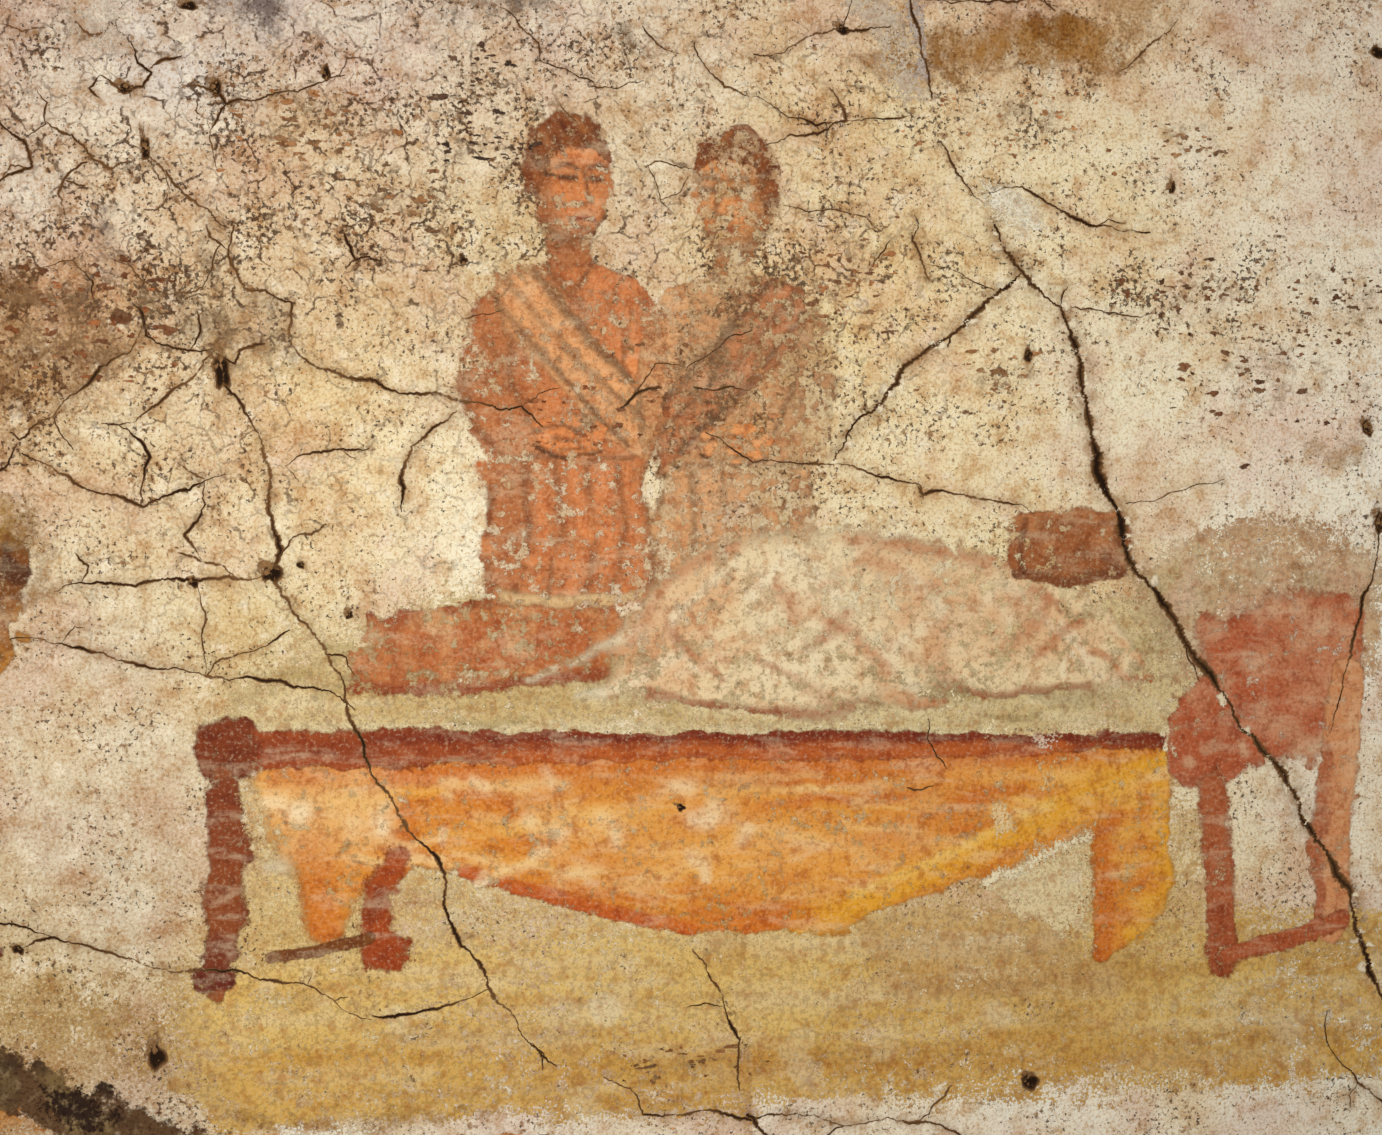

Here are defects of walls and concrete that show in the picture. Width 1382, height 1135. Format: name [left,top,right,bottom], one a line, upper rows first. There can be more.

crack [1,20,345,171]
crack [500,7,644,121]
crack [642,0,1057,147]
crack [1117,19,1178,73]
crack [647,160,690,213]
crack [620,330,752,408]
crack [0,91,558,1070]
crack [705,139,1382,1000]
hole [144,1032,168,1072]
crack [604,949,961,1135]
crack [1324,1010,1382,1107]
spalling [273,1111,382,1135]